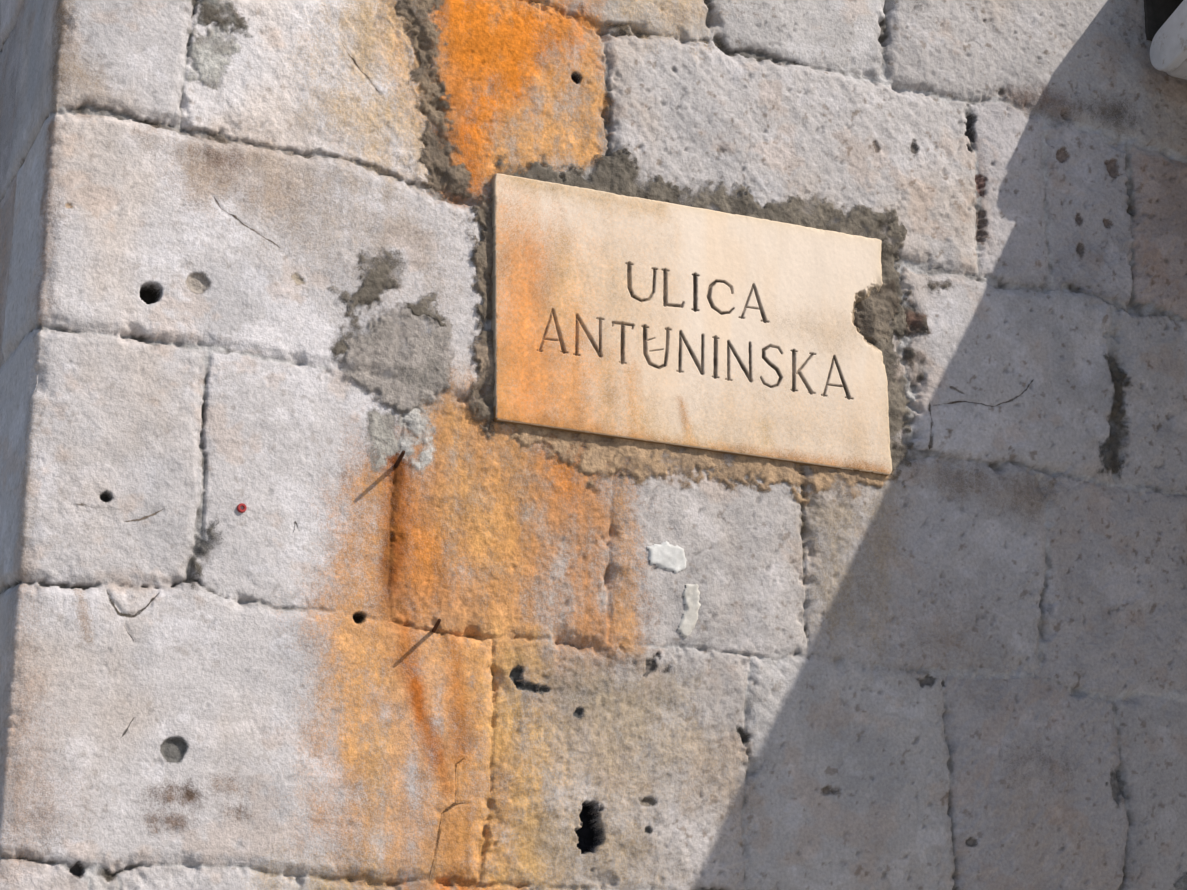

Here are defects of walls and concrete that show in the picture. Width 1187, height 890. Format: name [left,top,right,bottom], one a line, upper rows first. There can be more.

corrosion [241,0,892,890]
peeling [647,541,701,638]
crack [428,758,465,881]